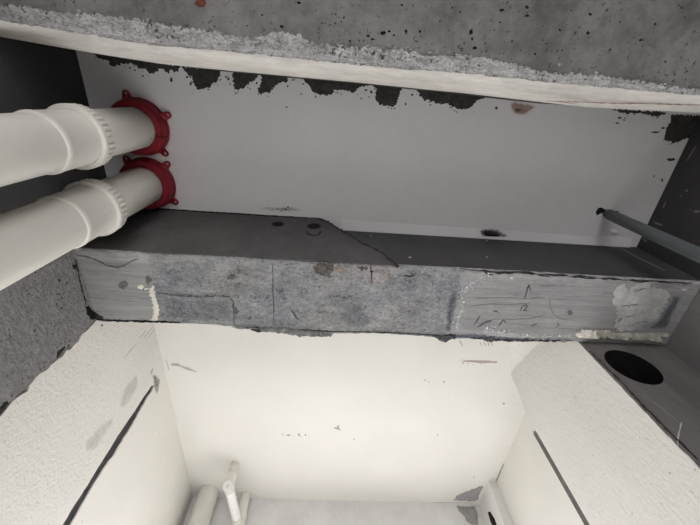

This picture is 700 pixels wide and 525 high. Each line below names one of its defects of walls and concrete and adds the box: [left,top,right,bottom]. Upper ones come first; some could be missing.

peeling [93,53,406,109]
peeling [411,90,485,111]
corrosion [512,103,533,114]
peeling [612,109,700,145]
crack [74,256,138,304]
spalling [312,261,345,277]
crack [157,292,235,325]